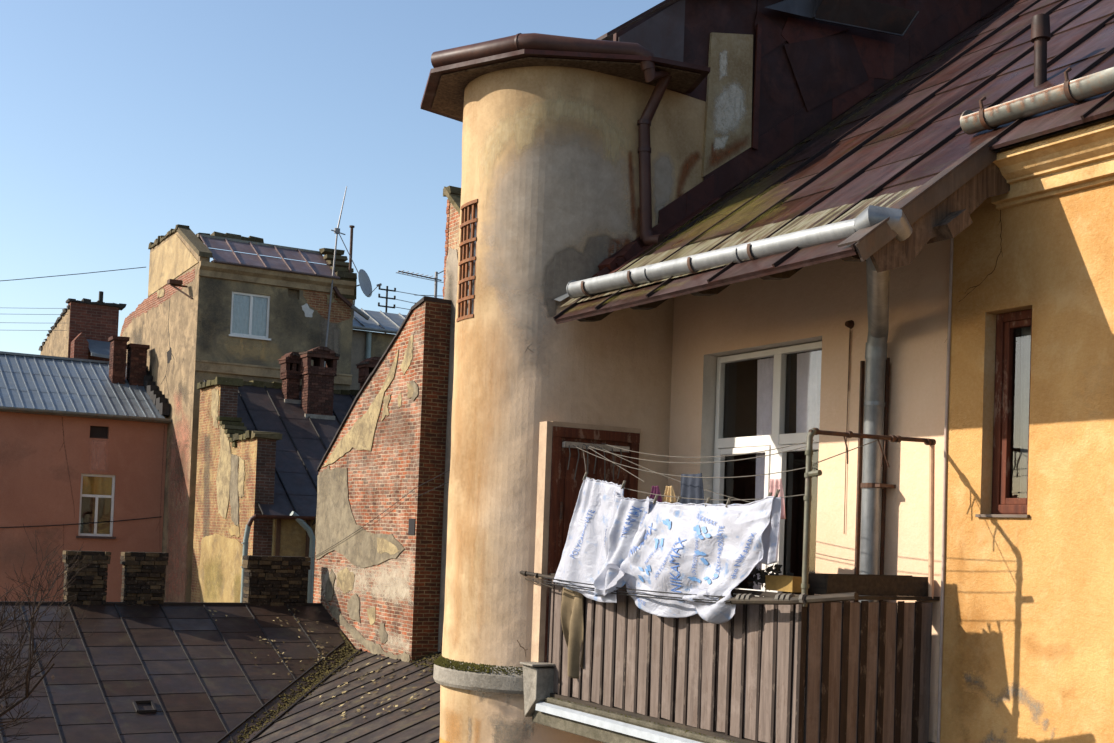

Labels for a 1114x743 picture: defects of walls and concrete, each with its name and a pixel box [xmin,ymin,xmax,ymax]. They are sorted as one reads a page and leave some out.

spalling [302,290,353,323]
damp [482,99,627,355]
rust [678,141,747,197]
peeling [198,388,245,603]
peeling [315,334,419,663]